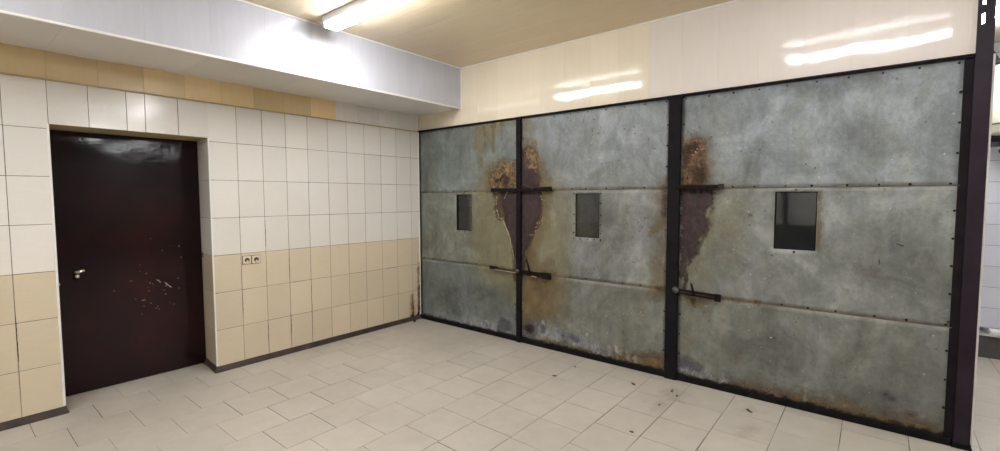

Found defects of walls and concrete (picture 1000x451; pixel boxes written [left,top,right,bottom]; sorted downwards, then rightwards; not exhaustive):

water stain [411,267,607,357]
rust [476,120,667,370]
rust [679,137,715,289]